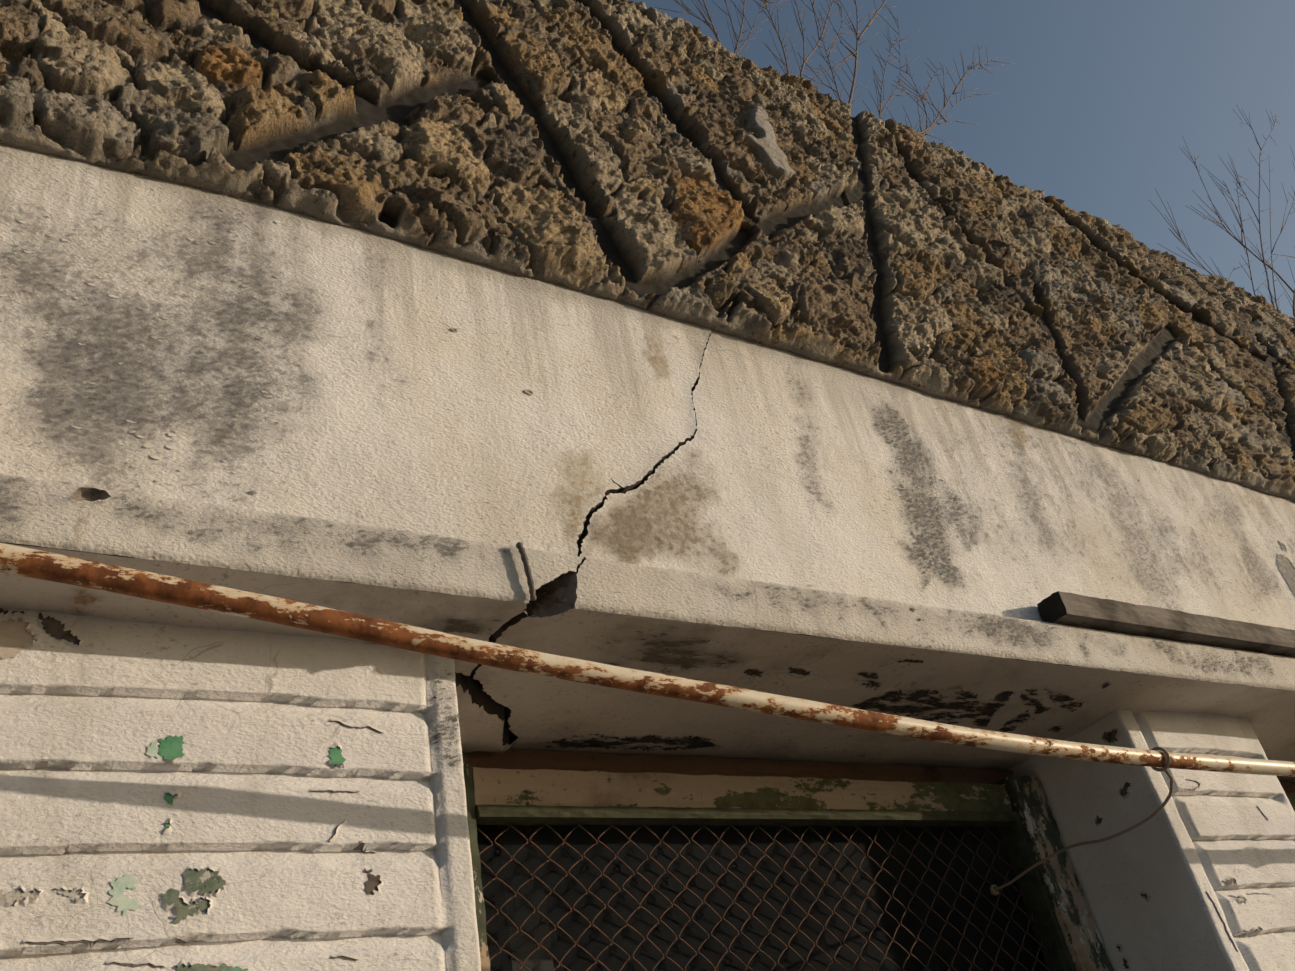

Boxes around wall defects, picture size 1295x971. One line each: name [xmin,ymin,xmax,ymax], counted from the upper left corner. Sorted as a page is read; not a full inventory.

damp [0,195,332,557]
crack [574,330,749,573]
damp [325,523,511,574]
damp [555,453,1126,657]
spalling [523,571,578,618]
peeling [0,607,84,659]
crack [455,601,533,746]
peeling [852,672,1085,732]
peeling [158,735,185,767]
peeling [160,866,226,923]
peeling [364,868,384,895]
peeling [175,959,248,971]